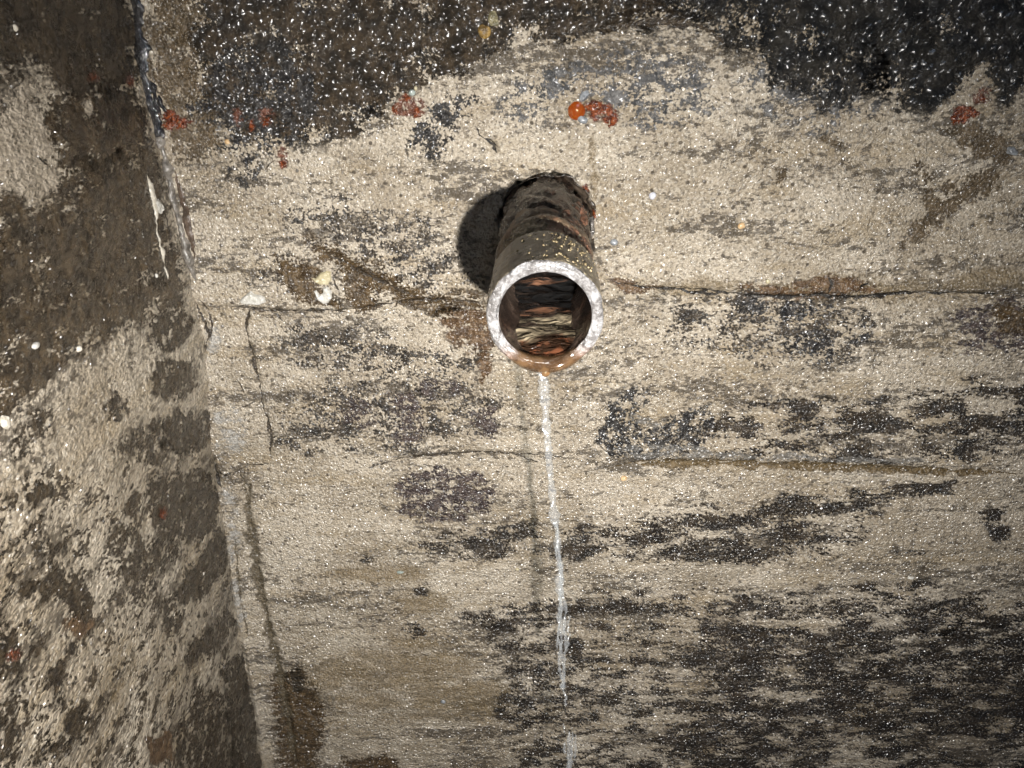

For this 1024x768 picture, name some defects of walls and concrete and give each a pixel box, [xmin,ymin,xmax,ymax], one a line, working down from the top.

corrosion [162,110,193,131]
corrosion [392,93,426,119]
corrosion [583,100,618,128]
corrosion [950,88,992,125]
damp [0,0,1024,430]
corrosion [498,174,596,243]
crack [604,277,1024,312]
crack [195,239,484,488]
damp [910,414,984,459]
damp [0,508,72,601]
damp [0,651,85,768]
damp [683,597,1024,768]